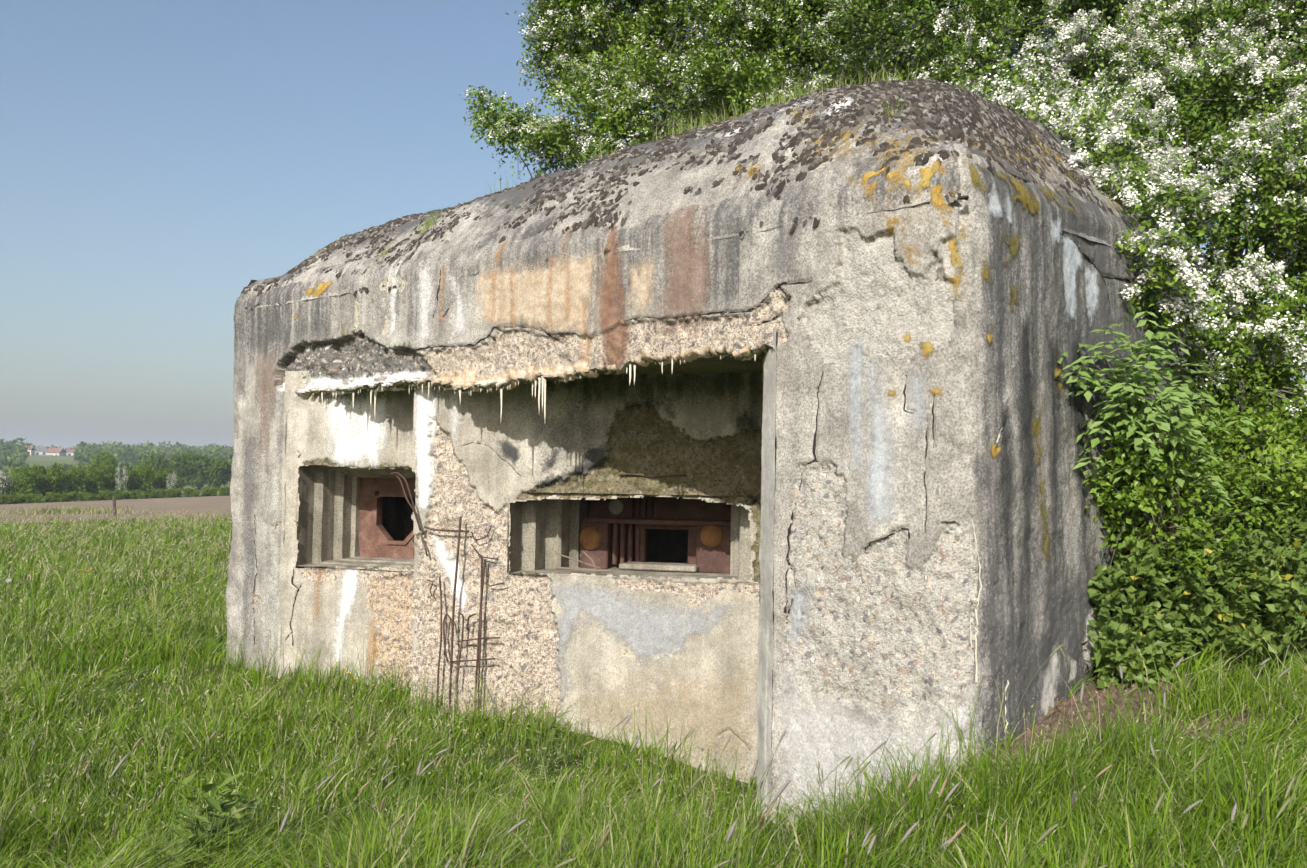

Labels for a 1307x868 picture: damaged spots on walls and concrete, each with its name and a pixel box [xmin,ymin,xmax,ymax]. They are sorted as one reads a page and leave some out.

rust [583,226,627,367]
peeling [274,228,958,388]
damp [988,184,1012,222]
damp [1050,220,1099,322]
damp [999,321,1118,639]
spalling [298,399,762,722]
spalling [783,461,980,714]